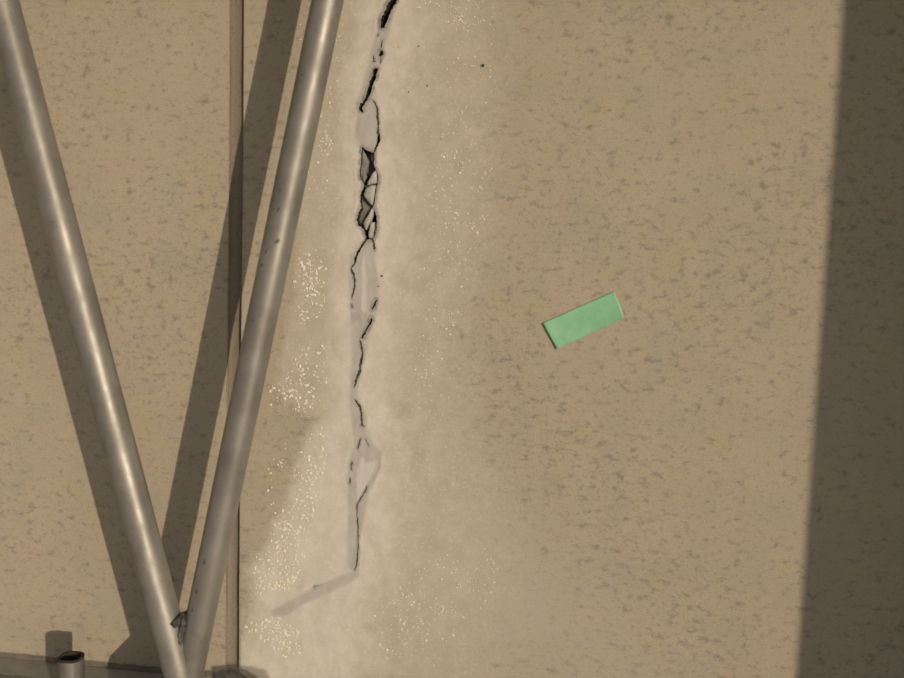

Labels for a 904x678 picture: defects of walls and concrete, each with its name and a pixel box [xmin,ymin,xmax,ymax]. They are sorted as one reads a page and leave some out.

crack [345,0,403,575]